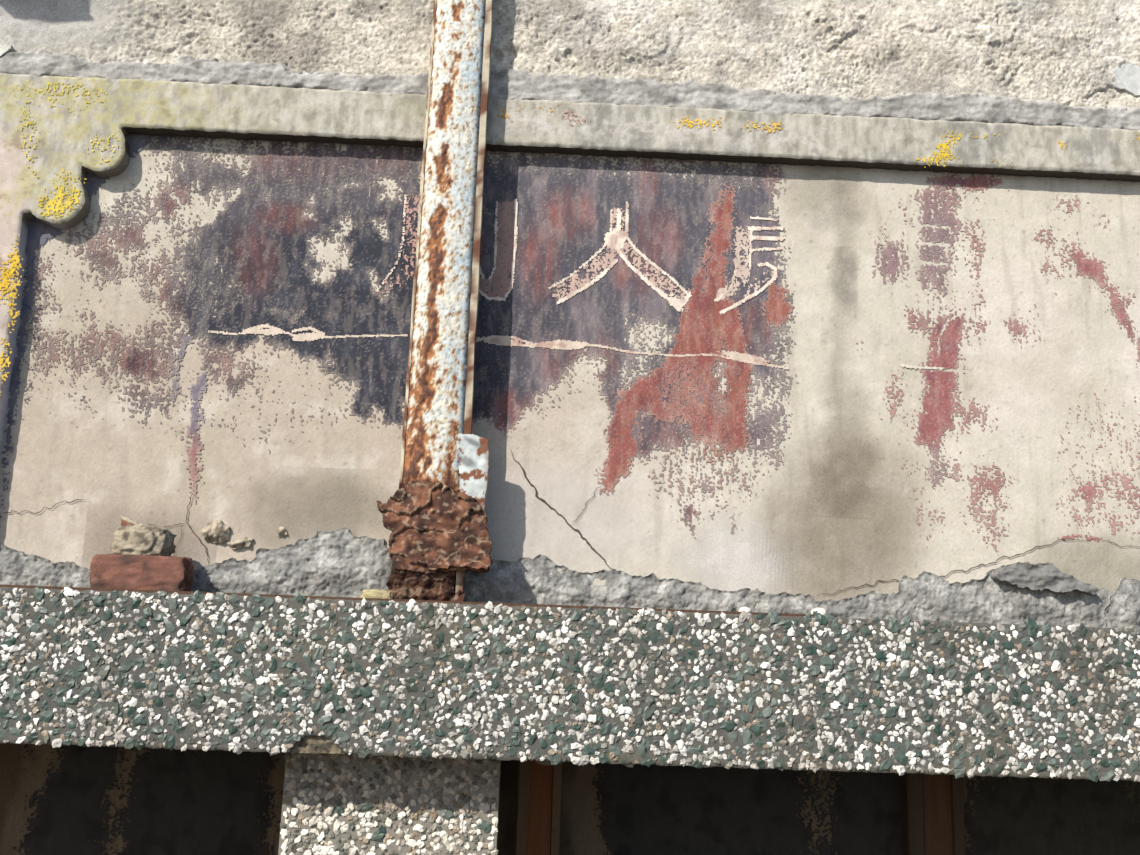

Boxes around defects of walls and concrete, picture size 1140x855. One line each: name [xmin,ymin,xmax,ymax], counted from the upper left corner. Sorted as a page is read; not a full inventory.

peeling [0,42,15,58]
peeling [670,115,725,130]
peeling [740,120,784,134]
peeling [0,81,423,518]
peeling [473,151,799,539]
peeling [872,131,1045,552]
peeling [1031,195,1140,367]
crack [510,449,612,569]
crack [814,579,899,597]
crack [939,537,1140,577]
peeling [1056,389,1140,542]
spalling [0,527,1140,855]